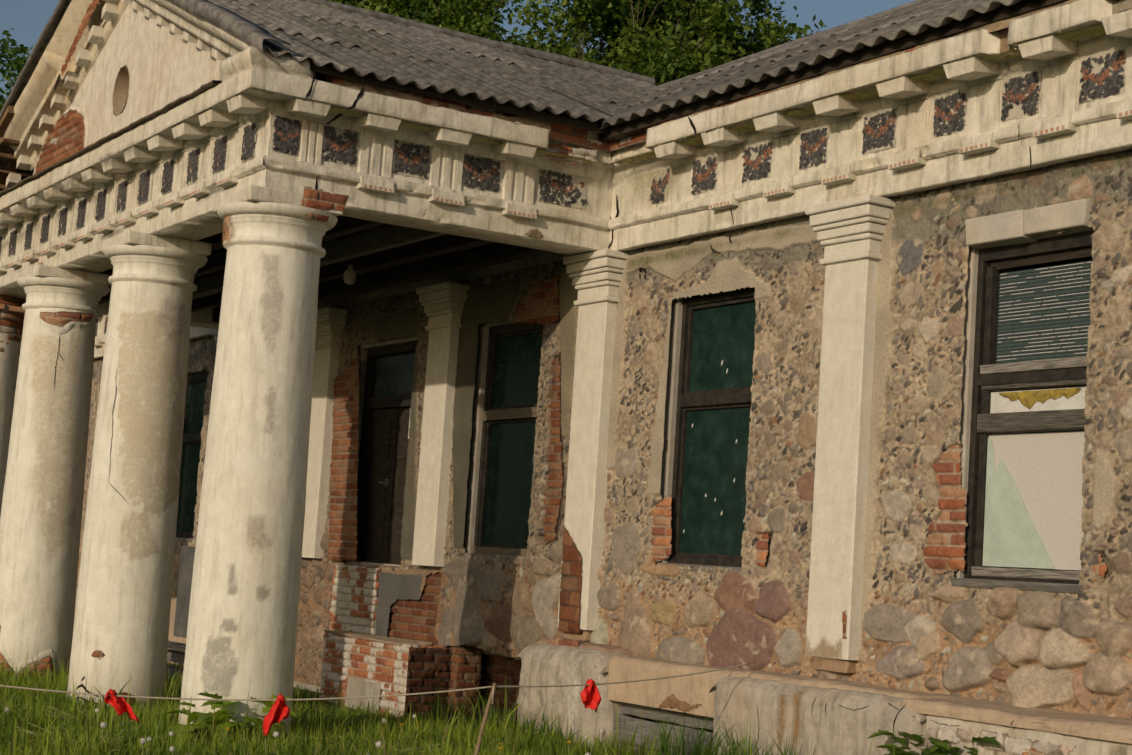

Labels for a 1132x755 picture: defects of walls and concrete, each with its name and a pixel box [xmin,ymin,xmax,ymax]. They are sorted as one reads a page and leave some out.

crack [304,69,315,101]
crack [324,85,365,126]
spalling [33,105,88,175]
spalling [299,186,349,223]
spalling [36,308,95,334]
spalling [509,277,559,325]
crack [108,370,129,504]
spalling [542,358,582,647]
spalling [652,495,672,562]
spalling [923,445,968,574]
spalling [0,646,58,683]
damp [203,620,236,696]